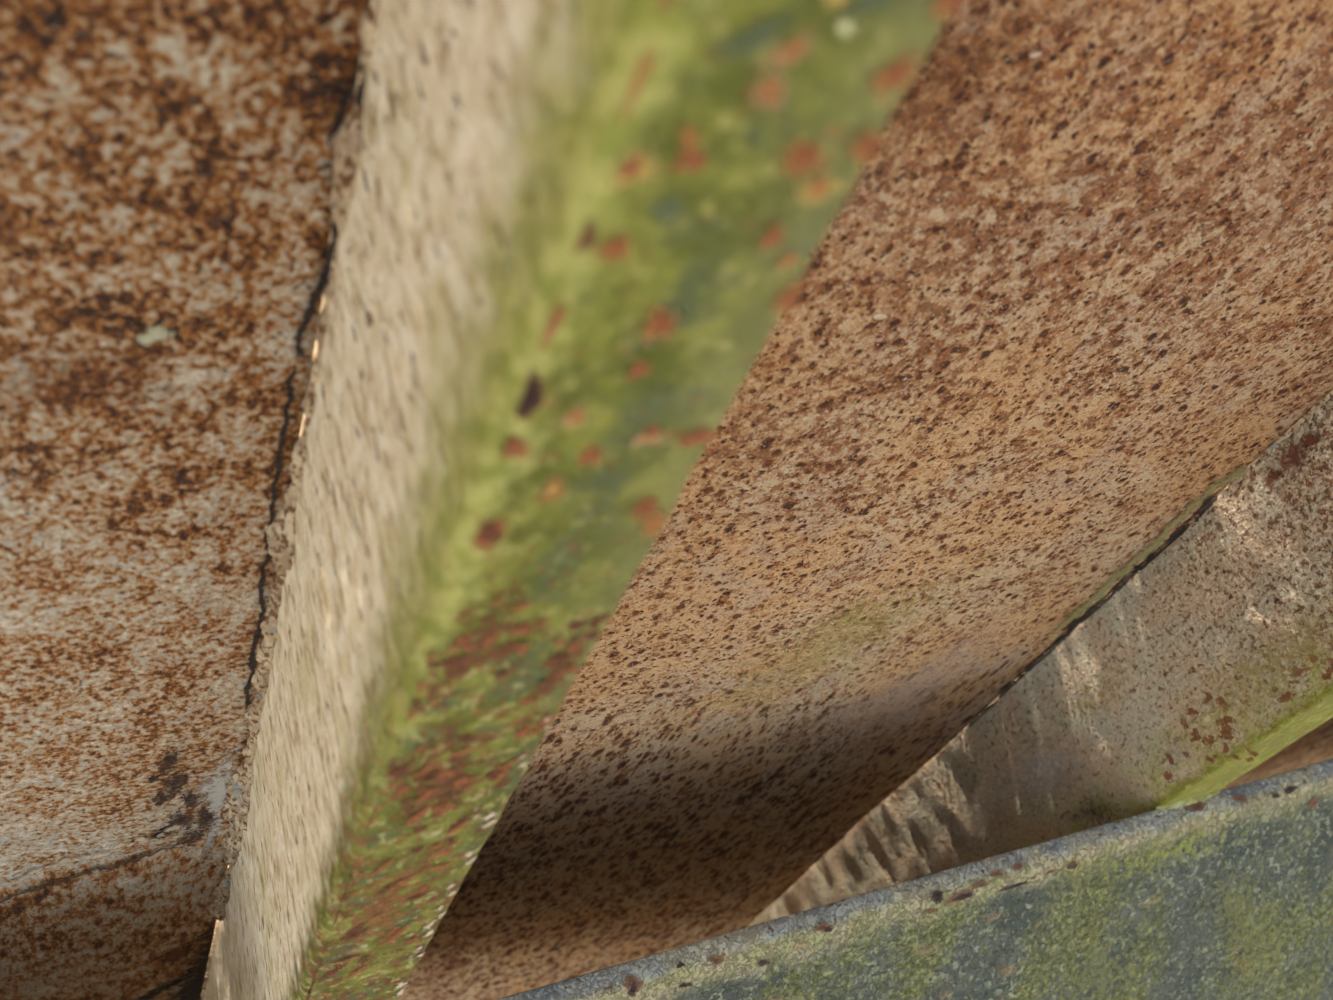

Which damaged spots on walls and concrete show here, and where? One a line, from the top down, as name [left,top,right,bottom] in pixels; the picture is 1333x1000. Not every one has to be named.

corrosion [837,20,853,35]
crack [318,63,365,172]
corrosion [575,223,628,260]
corrosion [516,373,544,419]
crack [243,204,338,710]
corrosion [502,437,528,458]
corrosion [473,520,505,550]
corrosion [1272,655,1333,703]
corrosion [1163,692,1259,783]
corrosion [306,593,608,1000]
crack [0,826,184,903]
corrosion [707,955,724,965]